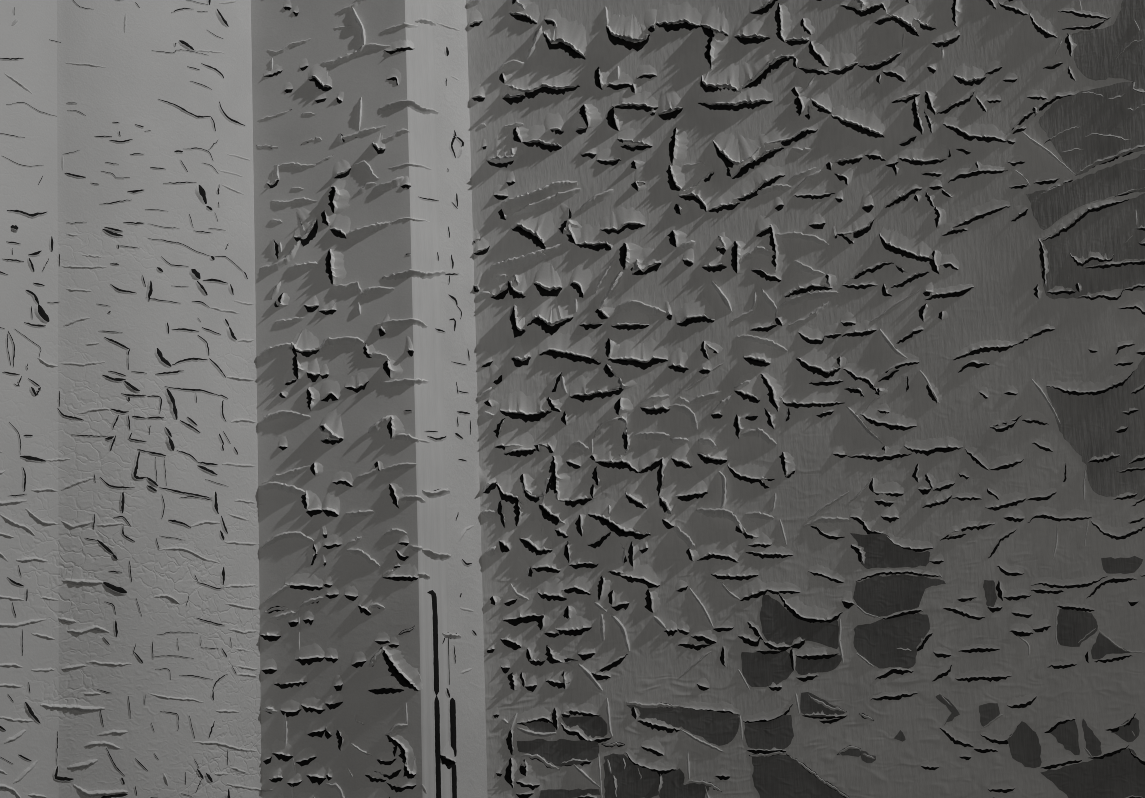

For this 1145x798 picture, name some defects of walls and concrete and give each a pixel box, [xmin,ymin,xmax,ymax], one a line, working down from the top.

peeling [258,0,418,122]
peeling [468,0,483,27]
peeling [337,97,410,154]
peeling [259,155,430,445]
peeling [279,435,288,450]
peeling [472,0,1145,798]
peeling [260,461,426,798]